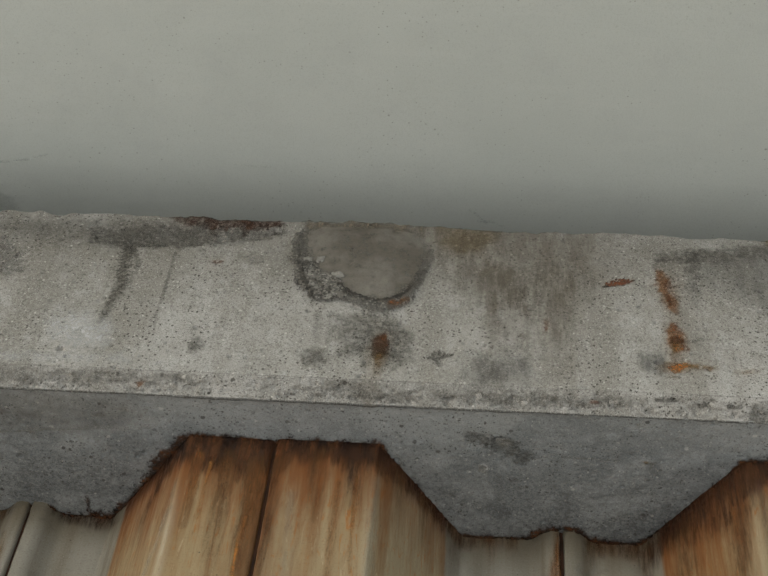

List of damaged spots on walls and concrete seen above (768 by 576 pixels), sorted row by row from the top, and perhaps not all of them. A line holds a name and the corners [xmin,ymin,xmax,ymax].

corrosion [170,216,284,231]
corrosion [602,278,635,288]
corrosion [656,270,679,311]
corrosion [667,323,689,352]
corrosion [667,363,698,372]
corrosion [48,432,768,576]